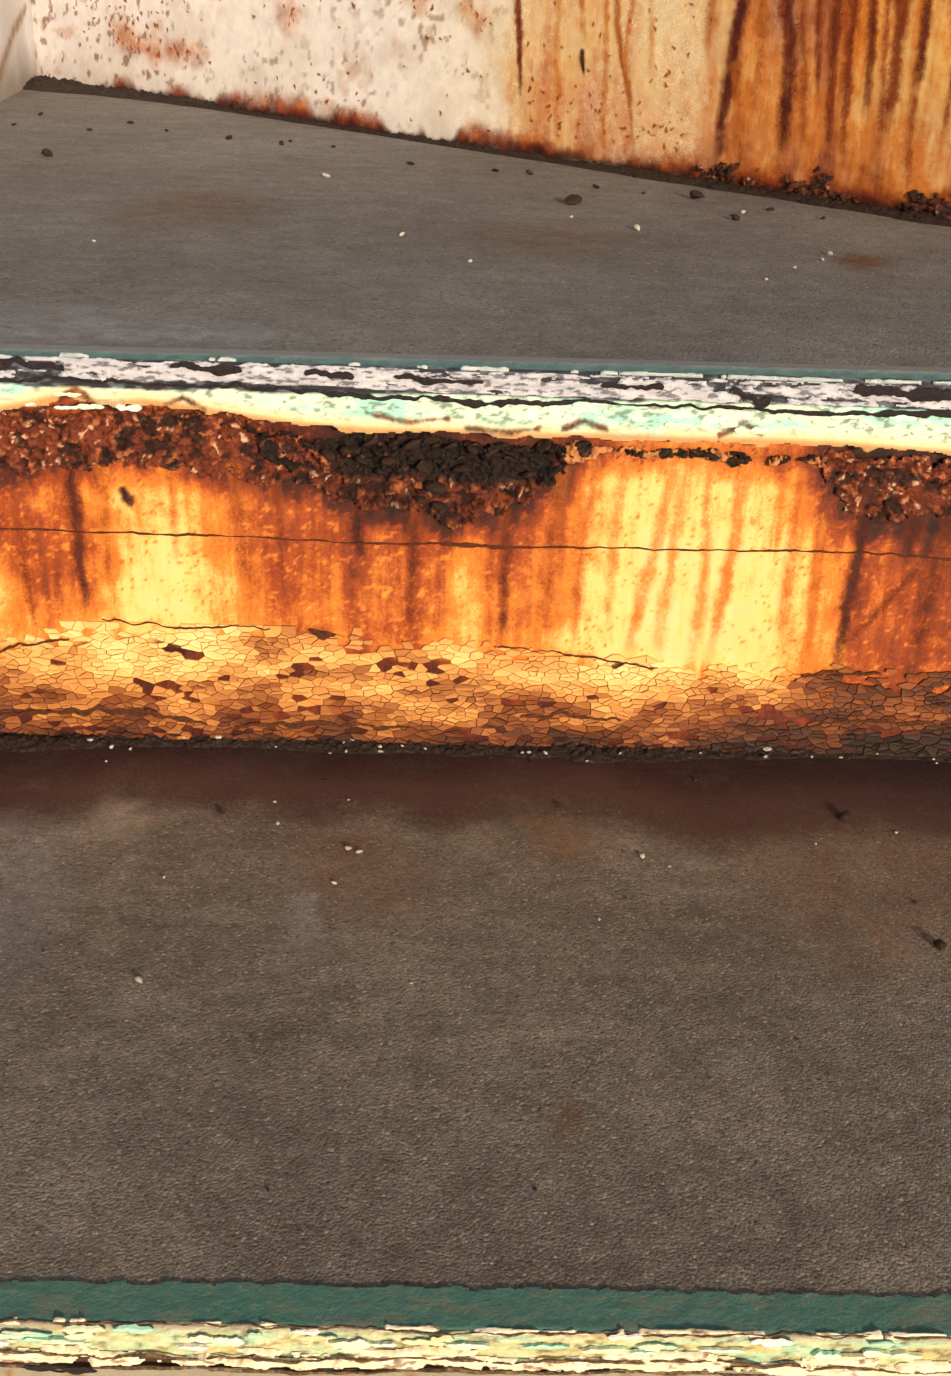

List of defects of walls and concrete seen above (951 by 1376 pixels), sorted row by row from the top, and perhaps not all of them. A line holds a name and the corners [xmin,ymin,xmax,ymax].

rust [104,0,951,219]
rust [20,397,98,417]
peeling [0,352,951,530]
crack [0,528,951,561]
rust [0,405,951,698]
crack [0,619,951,757]
peeling [0,1316,951,1376]